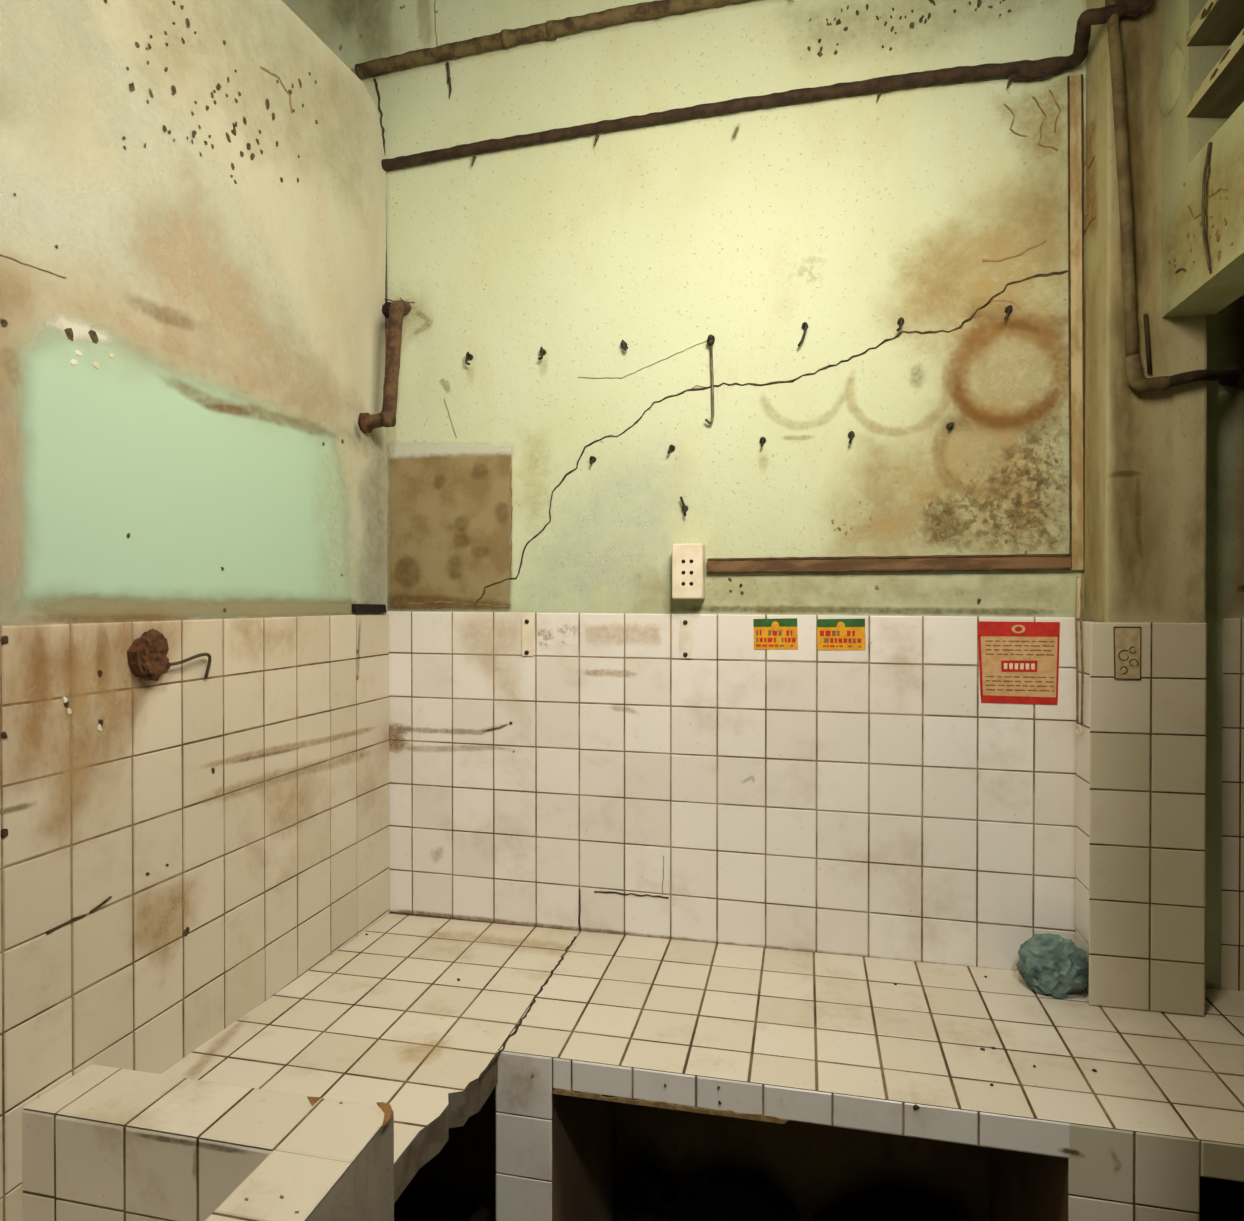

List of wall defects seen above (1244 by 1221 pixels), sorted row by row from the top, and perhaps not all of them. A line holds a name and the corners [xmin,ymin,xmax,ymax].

water stain [135,1,197,65]
water stain [260,66,317,113]
mould [807,0,935,57]
crack [0,245,66,278]
peeling [51,316,114,369]
water stain [121,66,294,344]
crack [475,240,1068,605]
water stain [831,213,1066,546]
corrosion [0,625,141,798]
crack [479,856,669,1078]